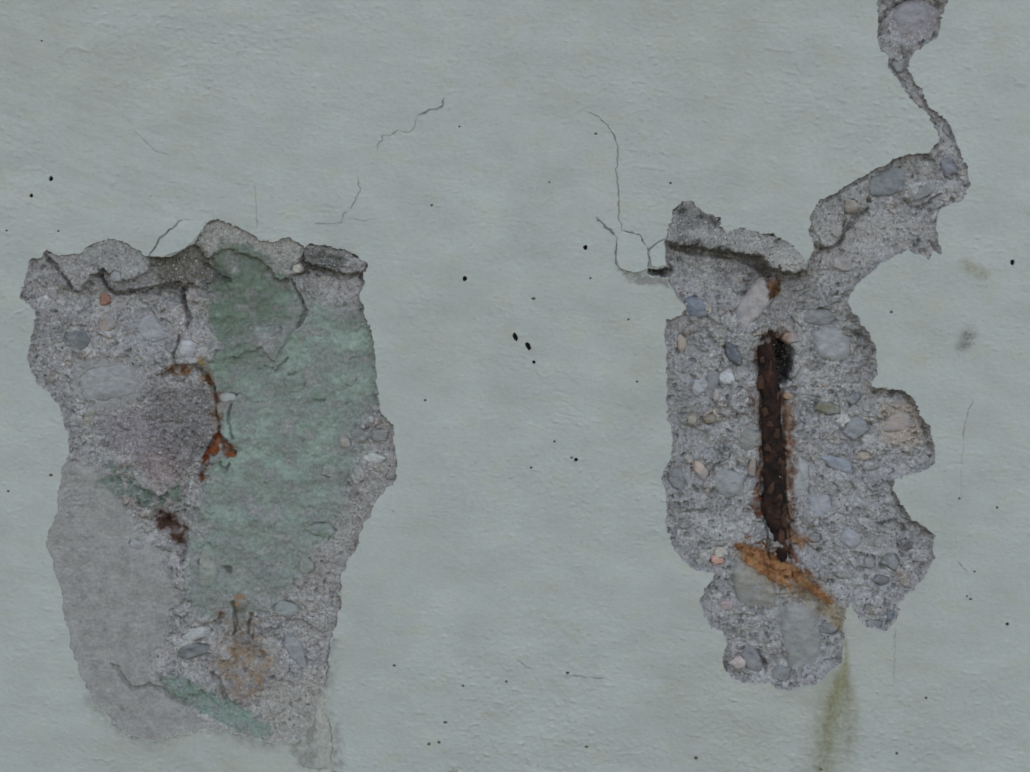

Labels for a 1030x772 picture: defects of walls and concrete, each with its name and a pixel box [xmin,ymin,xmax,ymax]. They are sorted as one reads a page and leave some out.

spalling [876,0,948,61]
corrosion [165,357,222,420]
spalling [20,219,398,767]
corrosion [199,433,237,481]
corrosion [734,407,833,605]
spalling [616,141,970,691]